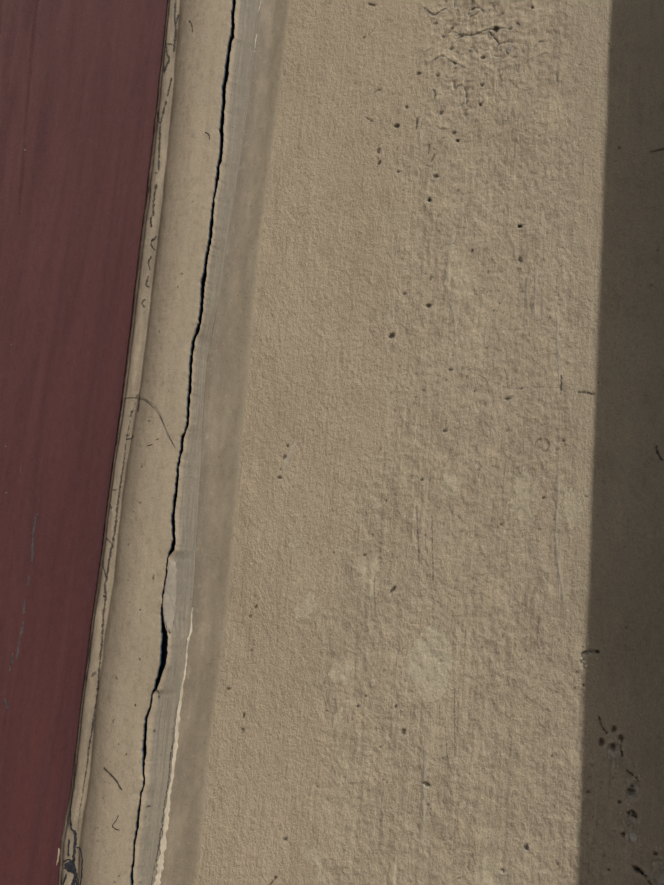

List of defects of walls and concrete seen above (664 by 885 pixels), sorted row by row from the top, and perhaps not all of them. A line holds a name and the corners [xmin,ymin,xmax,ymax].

crack [130,0,236,885]